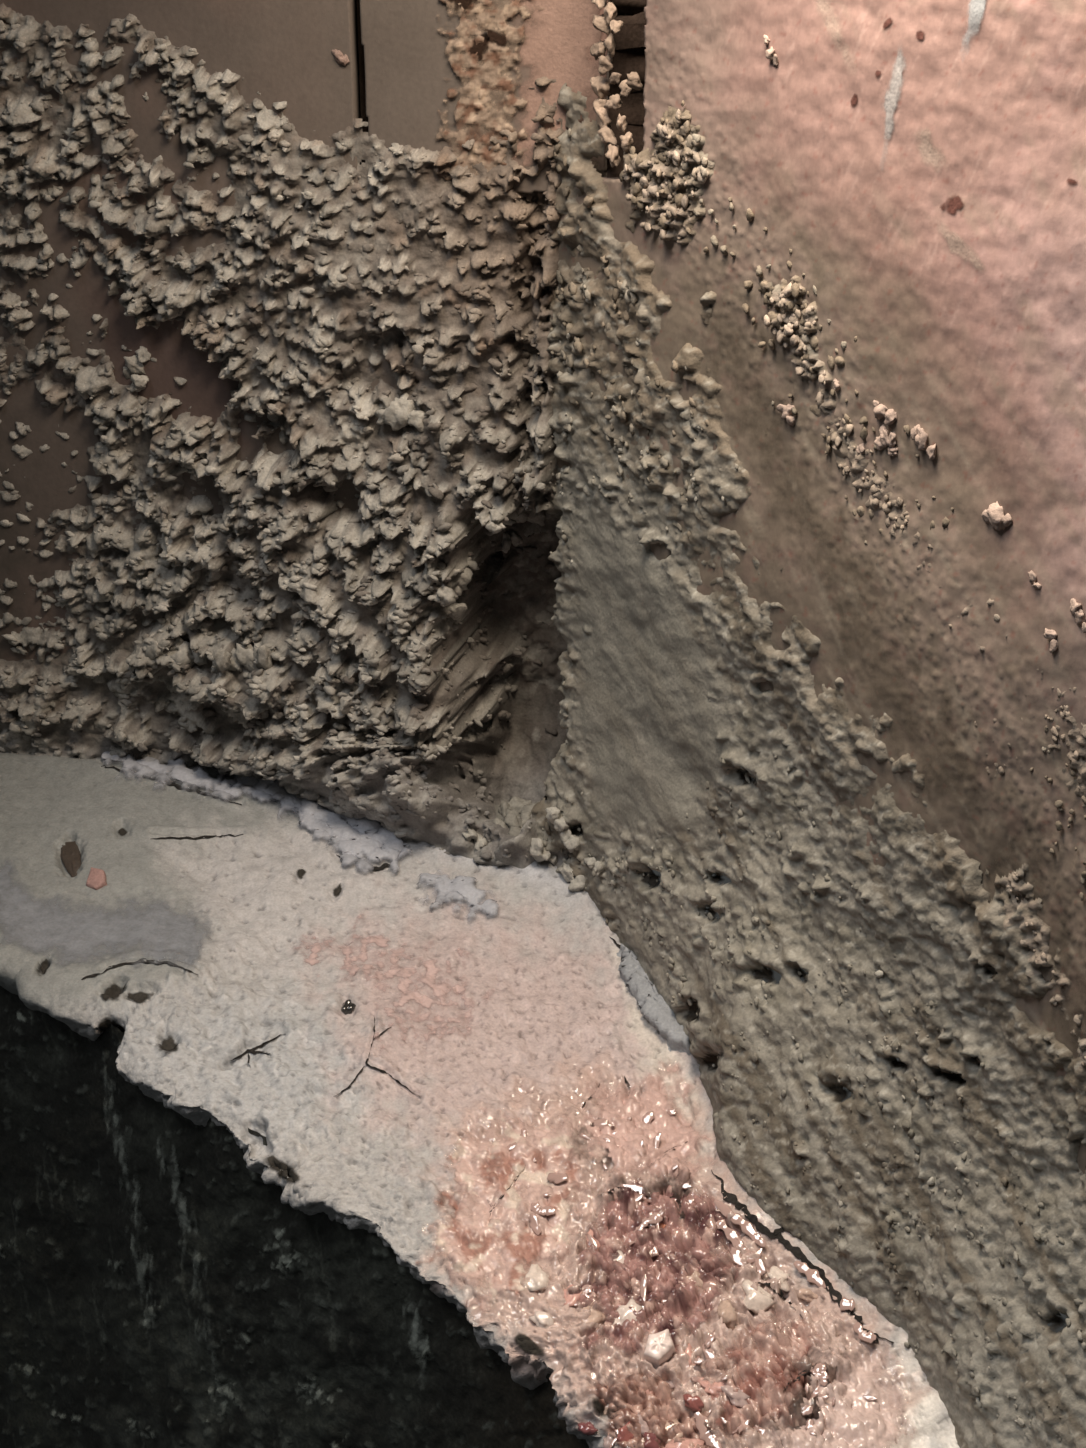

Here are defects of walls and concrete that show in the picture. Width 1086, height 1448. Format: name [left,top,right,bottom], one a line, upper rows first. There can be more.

peeling [101,751,412,872]
crack [230,1034,282,1068]
crack [336,1017,420,1097]
leakage [104,1074,152,1317]
leakage [157,1141,196,1232]
corrosion [425,1065,741,1355]
crack [711,1170,894,1344]
corrosion [590,1311,906,1448]